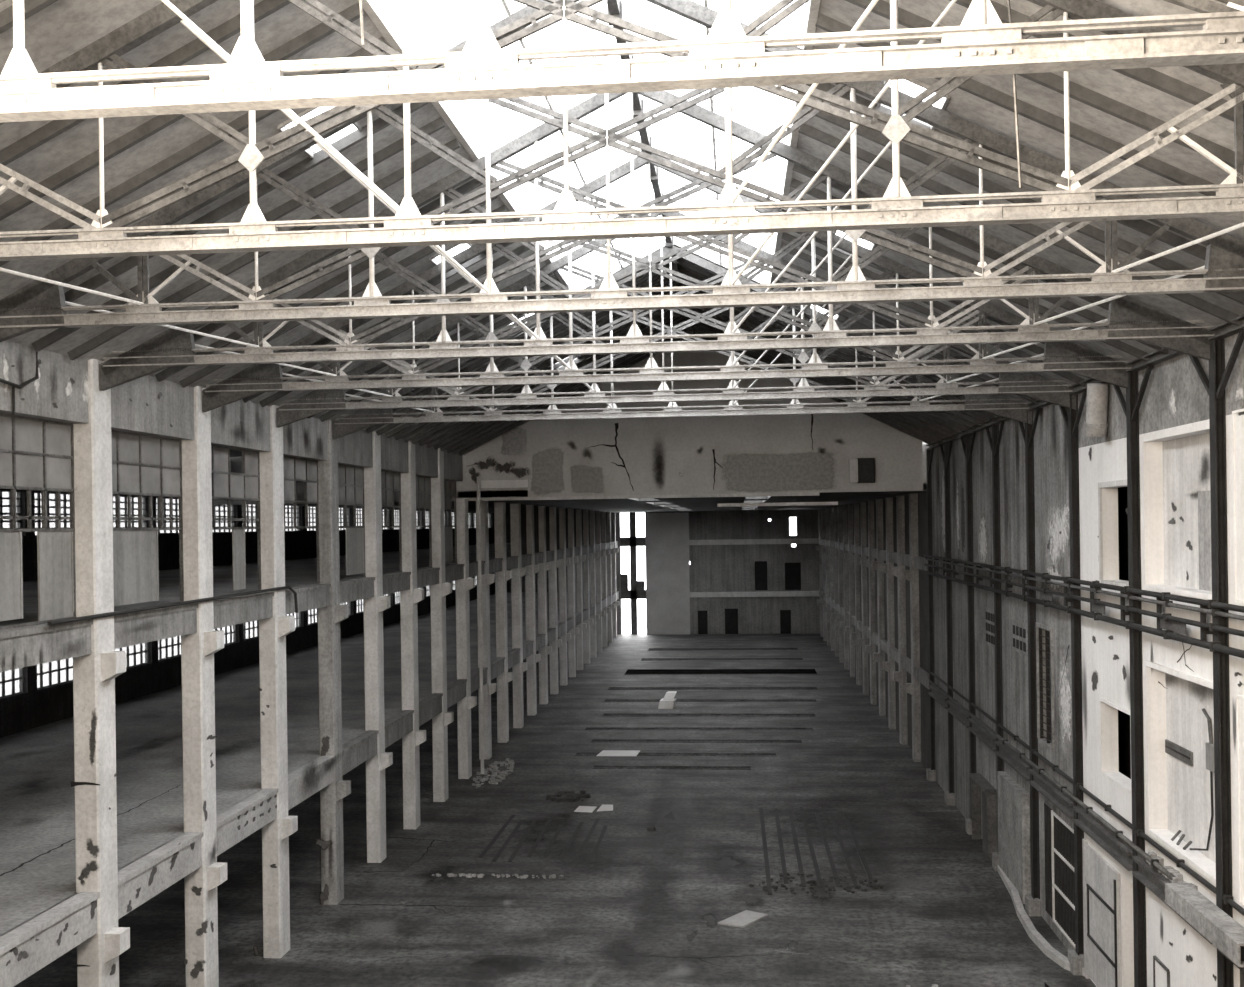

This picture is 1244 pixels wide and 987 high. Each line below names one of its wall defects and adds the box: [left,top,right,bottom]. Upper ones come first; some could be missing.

crack [592,423,634,491]
leakage [654,445,663,484]